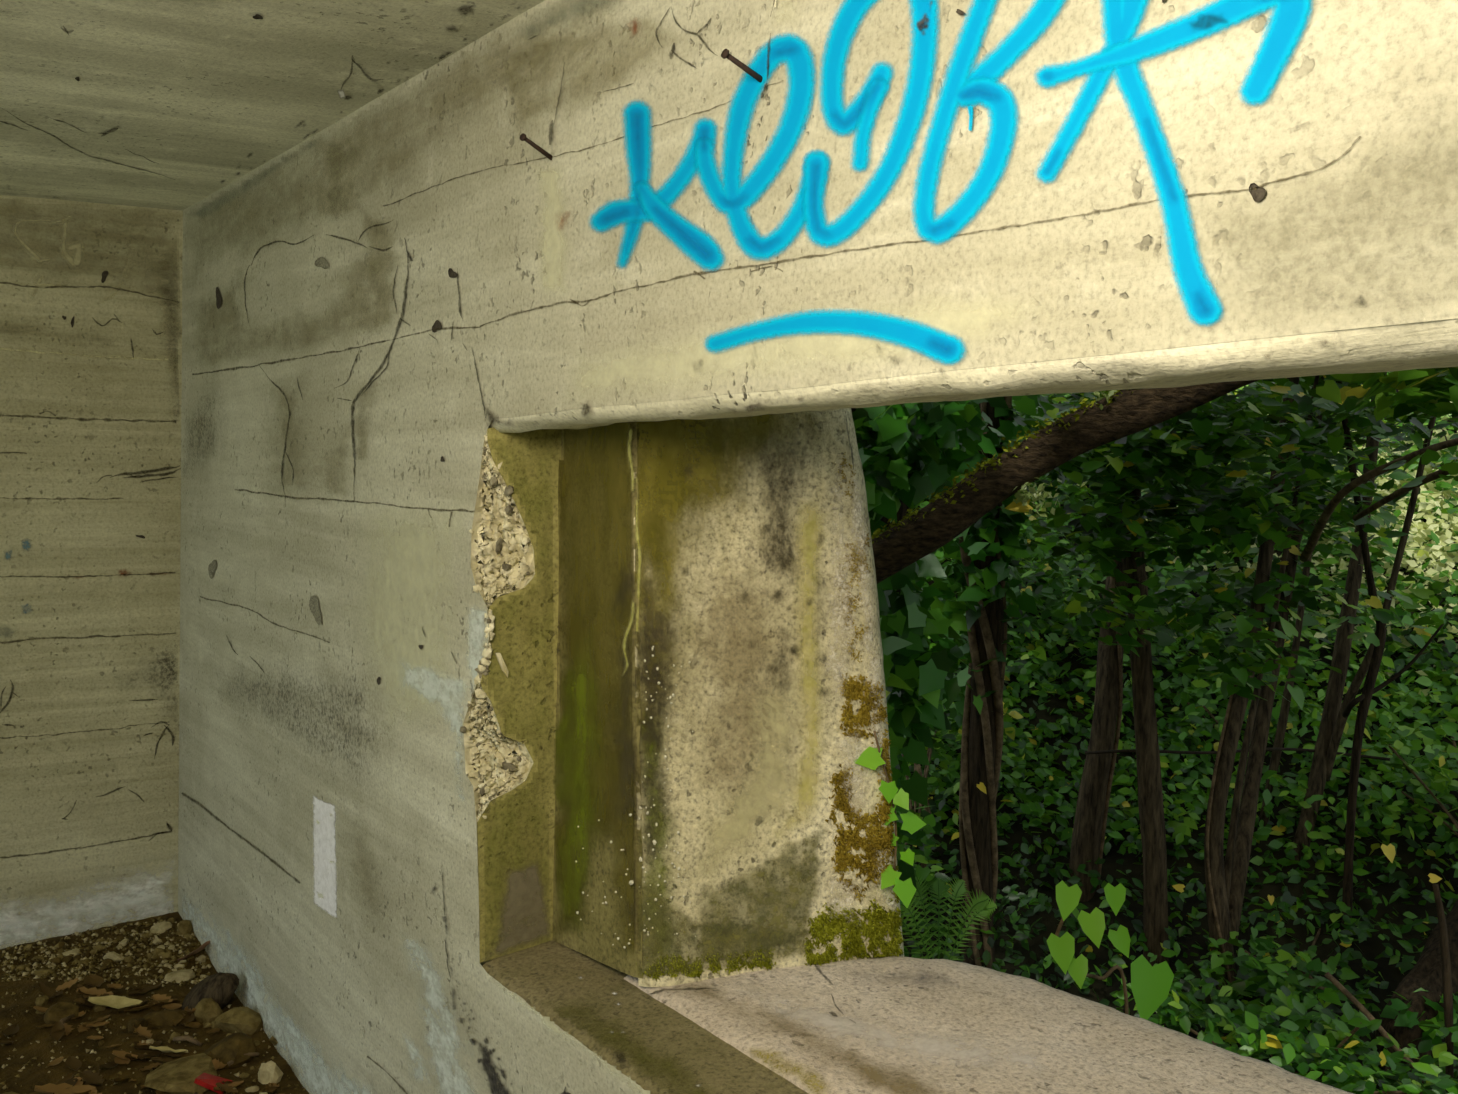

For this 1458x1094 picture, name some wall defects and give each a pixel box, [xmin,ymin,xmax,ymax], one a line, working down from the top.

crack [244,222,486,493]
spalling [460,432,535,822]
leakage [0,875,168,943]